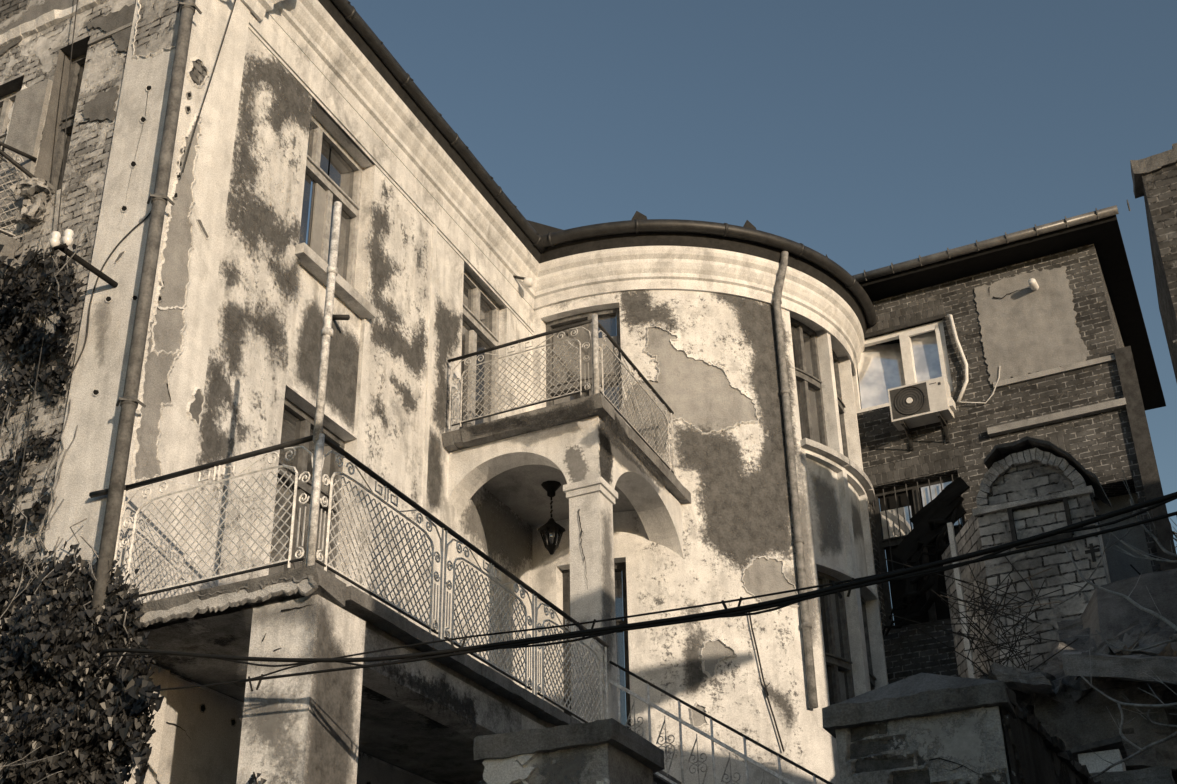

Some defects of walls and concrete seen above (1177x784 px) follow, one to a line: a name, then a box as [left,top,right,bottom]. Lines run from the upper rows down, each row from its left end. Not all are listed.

peeling [0,38,22,56]
flaking render [0,0,45,30]
flaking render [87,0,183,59]
peeling [82,86,120,122]
peeling [615,290,800,735]
spalling [120,556,318,646]
peeling [850,707,1015,784]